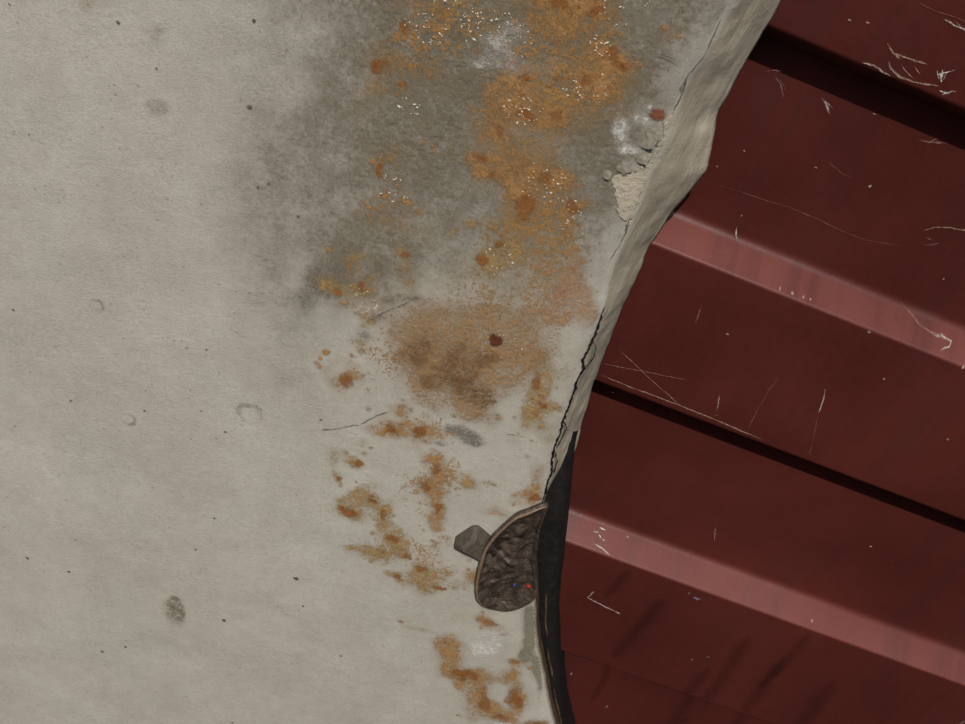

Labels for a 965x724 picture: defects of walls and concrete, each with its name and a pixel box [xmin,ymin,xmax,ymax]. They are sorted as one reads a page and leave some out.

water stain [275,0,708,319]
corrosion [316,0,665,594]
crack [542,307,605,502]
corrosion [476,611,506,636]
corrosion [434,635,548,724]